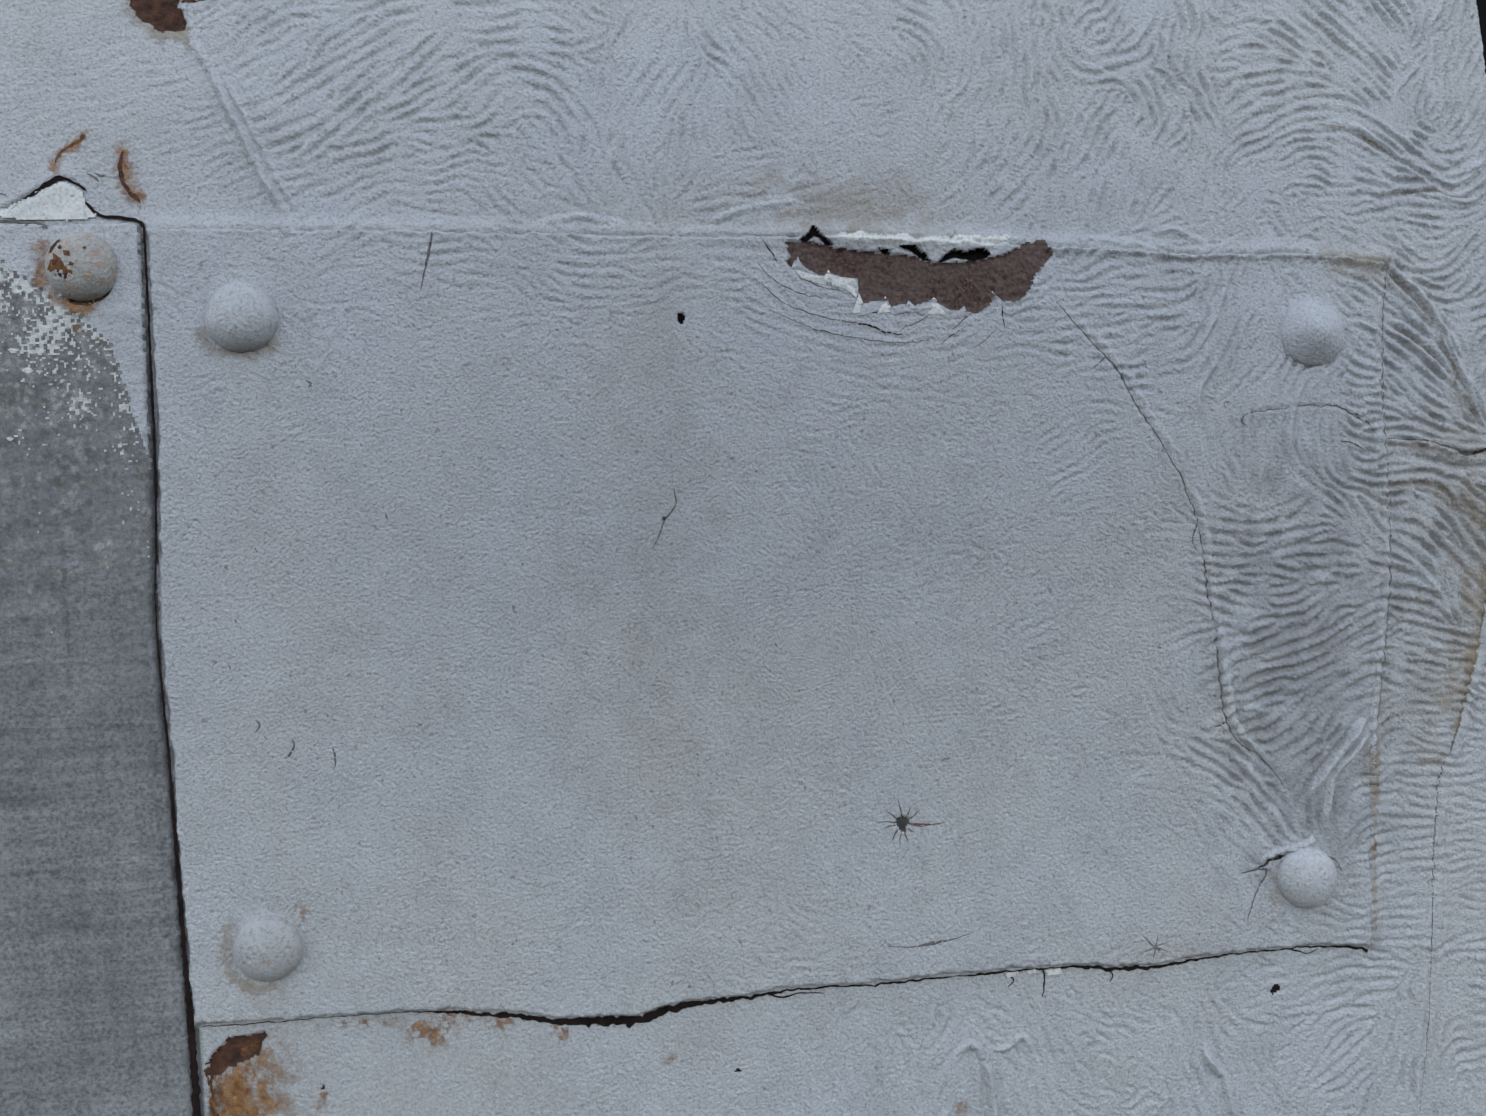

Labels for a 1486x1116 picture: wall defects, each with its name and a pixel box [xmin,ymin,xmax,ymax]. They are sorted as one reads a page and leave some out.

peeling [129,0,204,33]
corrosion [50,134,85,171]
corrosion [116,148,145,202]
corrosion [35,240,95,327]
peeling [754,225,1053,348]
peeling [0,173,158,637]
crack [143,226,1368,1116]
corrosion [204,1054,277,1116]